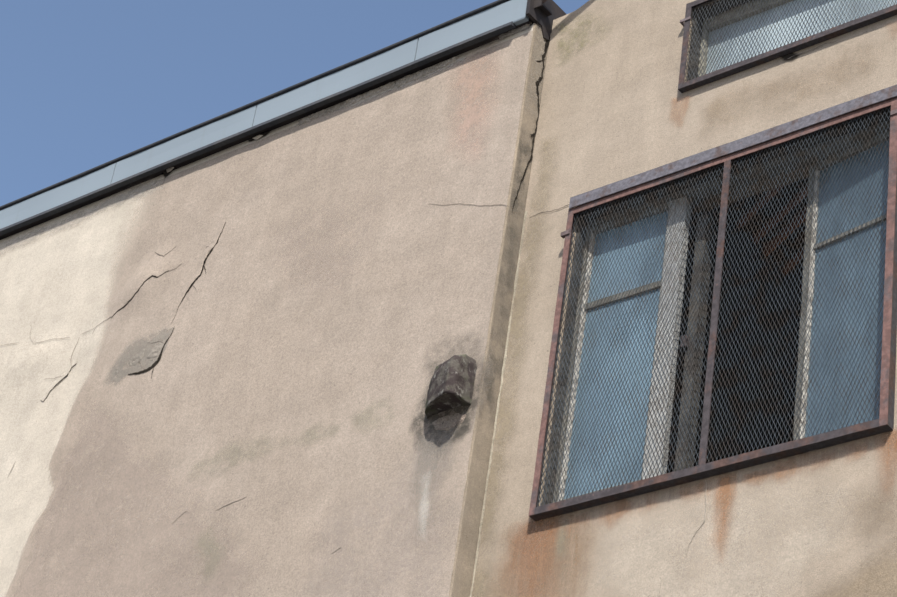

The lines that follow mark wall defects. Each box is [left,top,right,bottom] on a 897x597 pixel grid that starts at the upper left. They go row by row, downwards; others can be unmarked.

crack [435,37,569,216]
crack [6,222,226,401]
spalling [107,328,172,384]
water stain [6,31,551,597]